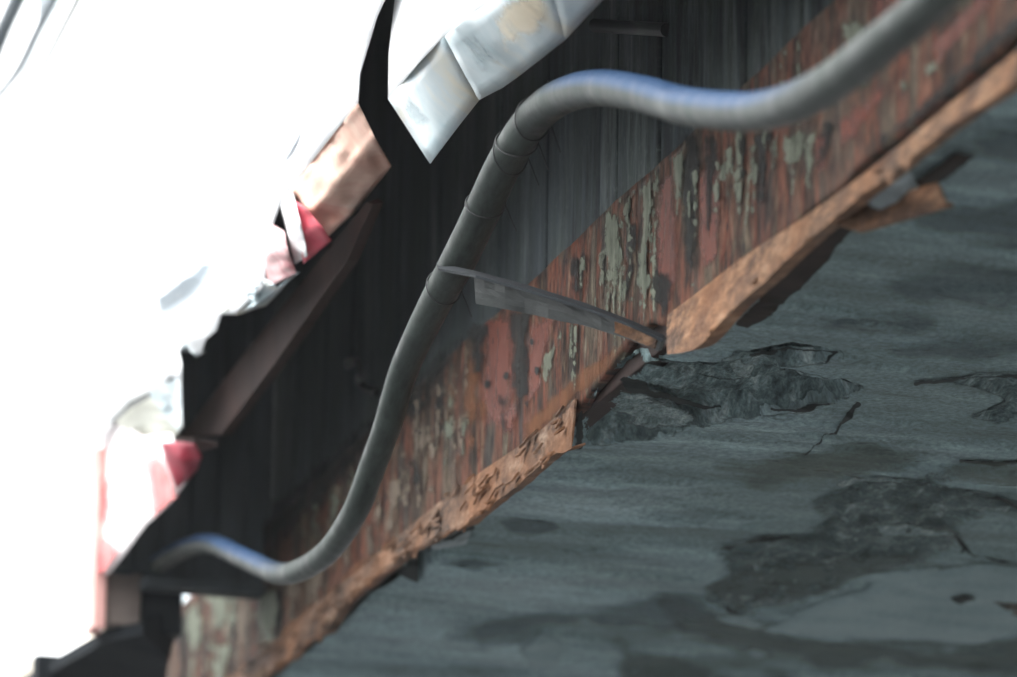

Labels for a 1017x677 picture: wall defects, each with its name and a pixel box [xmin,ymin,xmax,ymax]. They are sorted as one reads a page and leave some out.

peeling [841,19,864,44]
peeling [670,151,698,237]
peeling [713,119,816,225]
rust [835,182,954,233]
spalling [575,335,861,450]
crack [803,402,861,455]
spalling [914,372,1017,424]
spalling [706,470,1017,644]